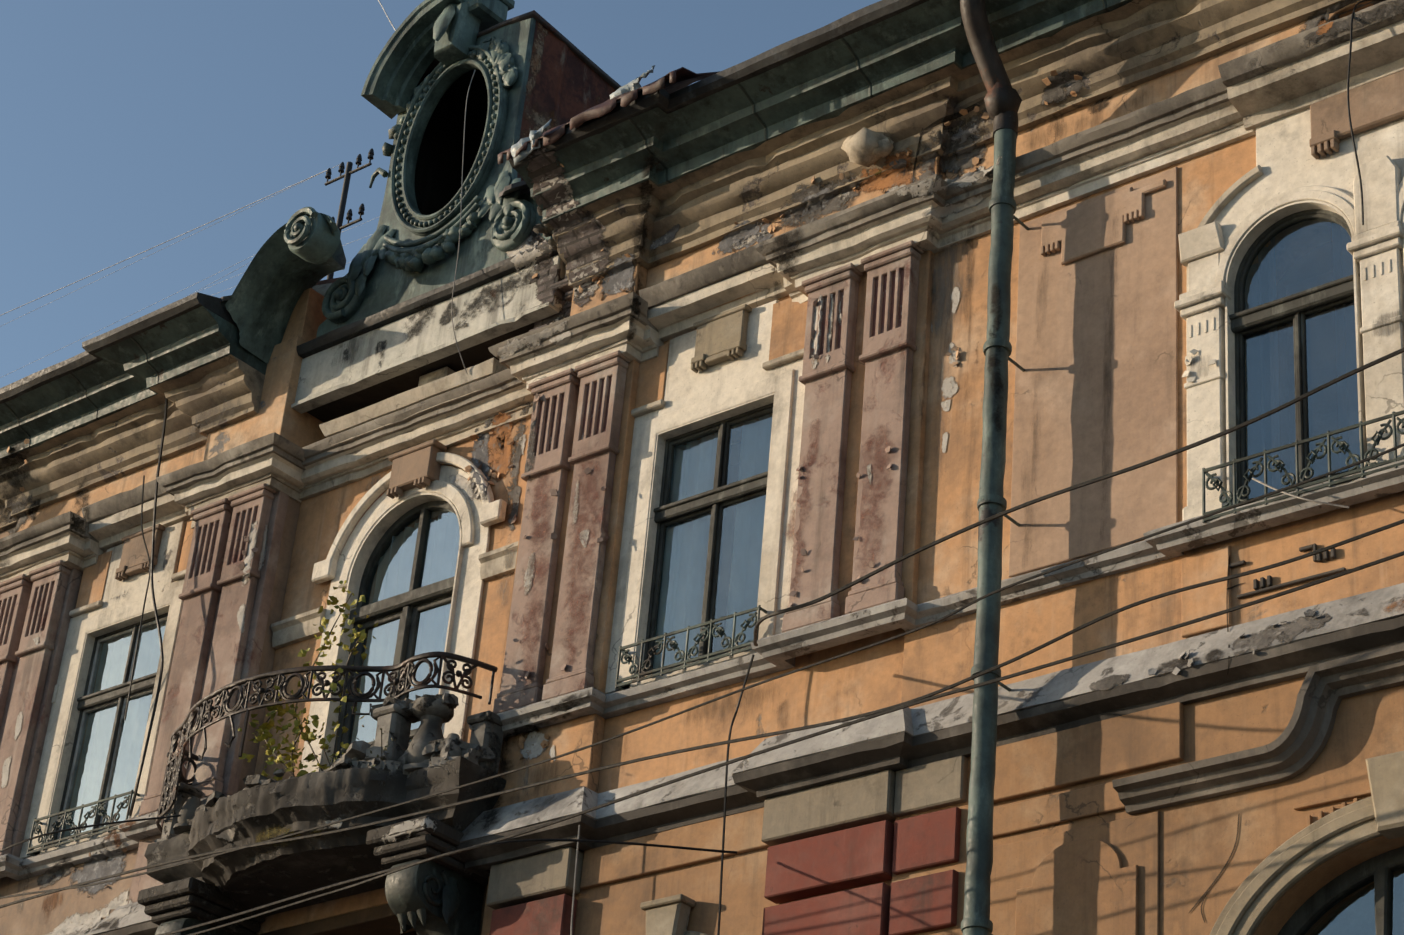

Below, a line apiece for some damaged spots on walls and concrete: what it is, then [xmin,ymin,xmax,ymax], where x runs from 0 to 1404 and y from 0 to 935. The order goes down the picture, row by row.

peeling [1316,17,1334,35]
peeling [1041,69,1083,105]
flaking render [712,106,1002,255]
flaking render [492,163,636,362]
spalling [0,439,41,535]
flaking render [449,388,609,671]
peeling [785,443,818,573]
peeling [852,436,892,580]
peeling [1089,674,1129,691]
flaking render [20,841,132,935]
crack [1189,815,1239,923]